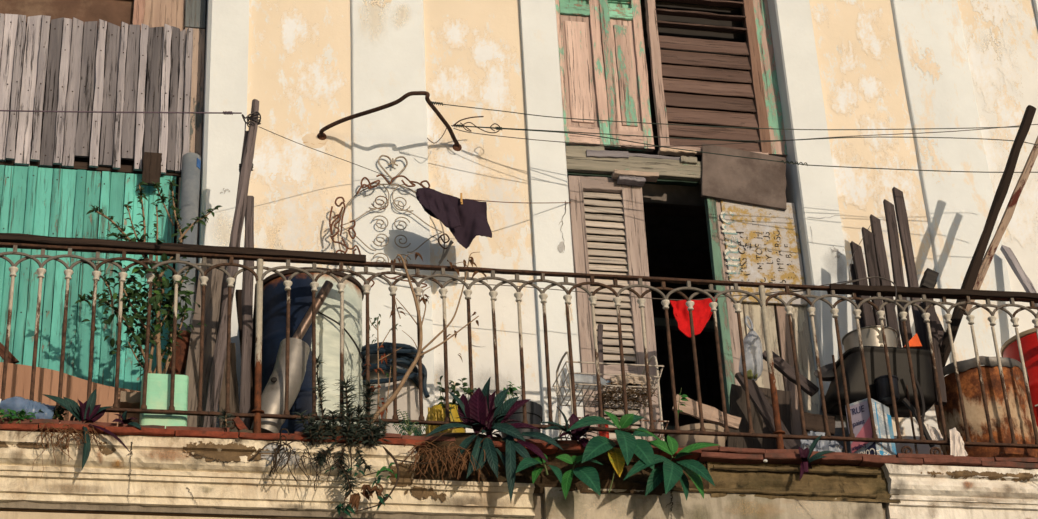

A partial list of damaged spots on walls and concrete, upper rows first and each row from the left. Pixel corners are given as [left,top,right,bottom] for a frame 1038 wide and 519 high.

peeling [278,2,349,108]
peeling [837,0,891,62]
peeling [910,40,942,85]
peeling [426,18,528,257]
peeling [827,73,942,235]
peeling [964,0,1038,252]
spalling [183,441,300,471]
spalling [389,462,455,502]